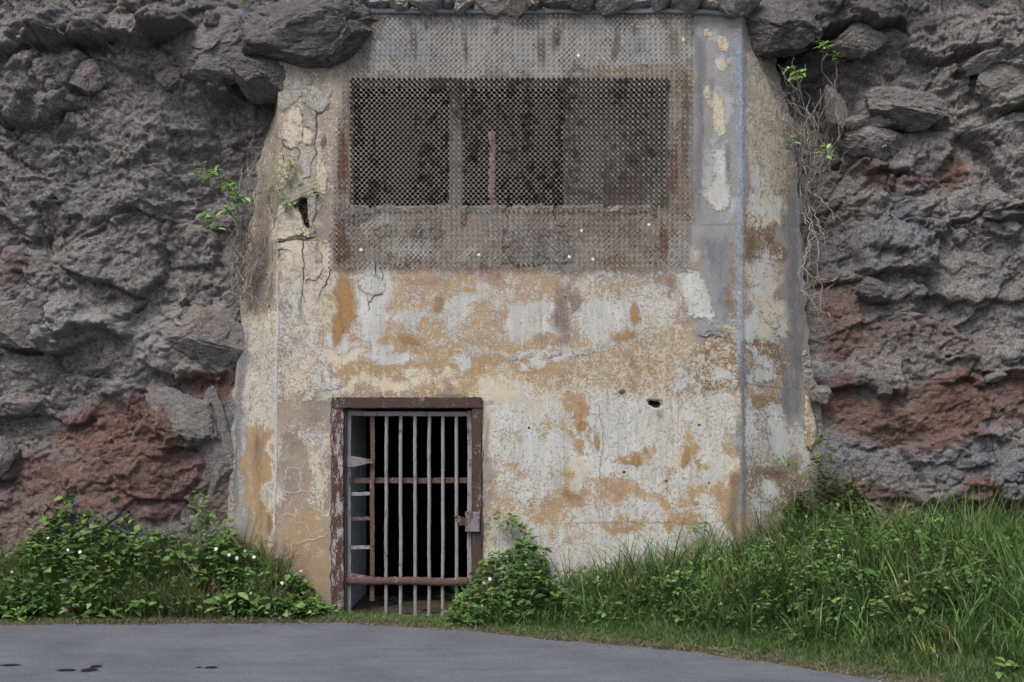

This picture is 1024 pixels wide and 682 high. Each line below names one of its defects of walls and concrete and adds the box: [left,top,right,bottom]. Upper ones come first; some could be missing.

peeling [703,28,729,72]
crack [282,109,327,165]
peeling [276,71,333,240]
peeling [701,85,732,212]
spalling [757,56,792,149]
crack [275,236,331,308]
peeling [676,270,715,326]
peeling [301,363,345,402]
peeling [296,429,326,515]